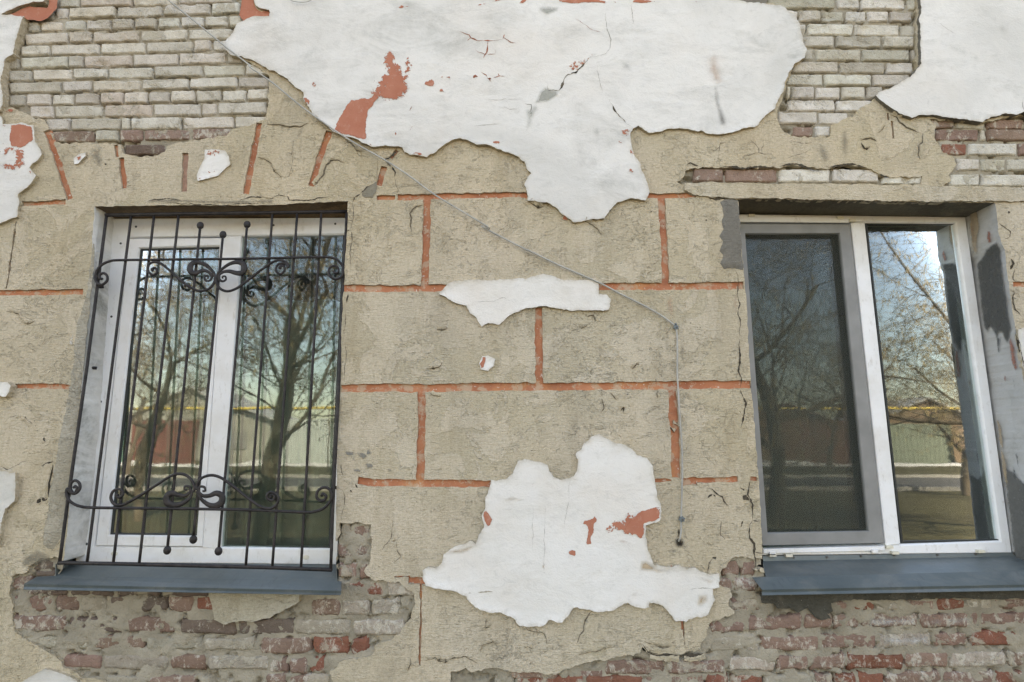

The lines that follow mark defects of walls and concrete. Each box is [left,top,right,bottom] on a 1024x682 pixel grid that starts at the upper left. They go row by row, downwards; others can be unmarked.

peeling [0,0,1024,225]
crack [736,272,747,426]
spalling [12,434,1024,682]
crack [694,482,762,589]